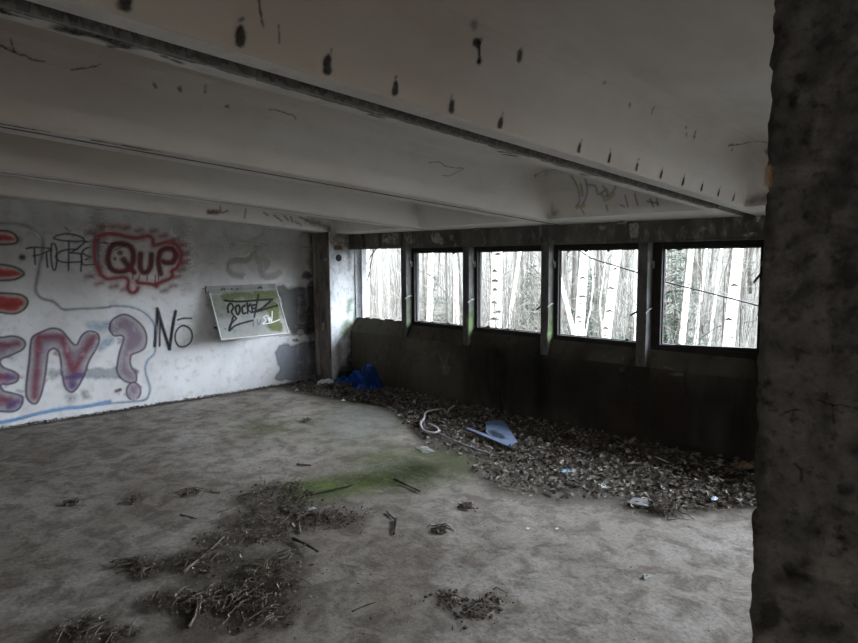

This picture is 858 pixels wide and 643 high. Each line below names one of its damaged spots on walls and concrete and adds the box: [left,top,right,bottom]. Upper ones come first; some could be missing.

water stain [0,218,330,381]